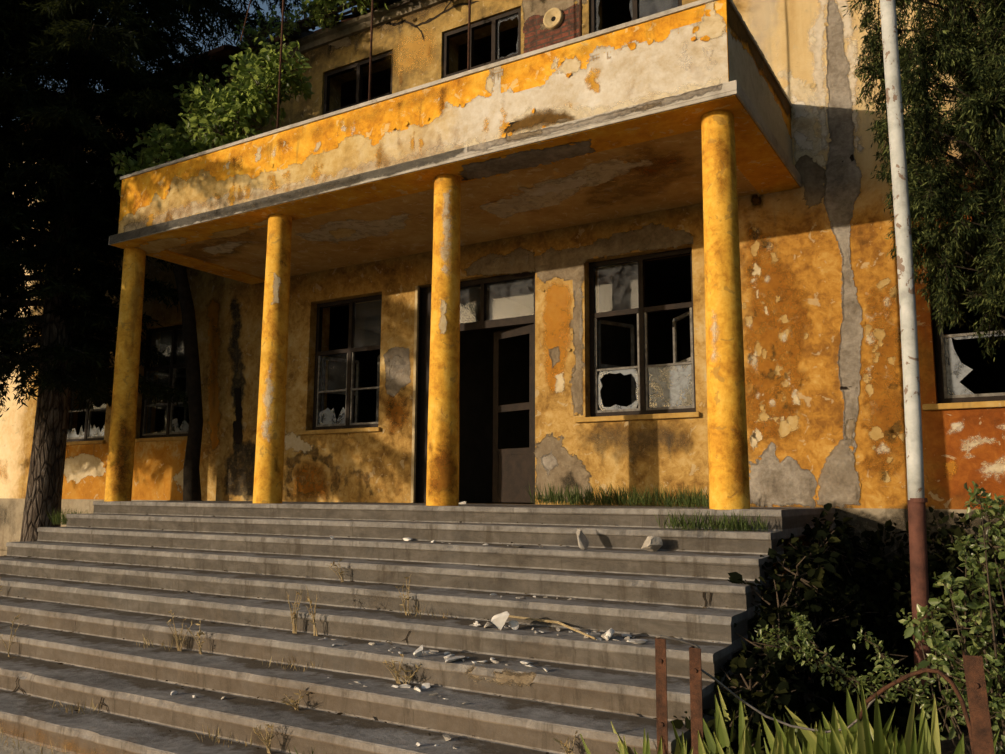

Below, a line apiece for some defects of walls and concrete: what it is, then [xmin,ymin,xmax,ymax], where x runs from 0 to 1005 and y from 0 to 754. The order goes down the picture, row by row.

peeling [118,0,906,508]
peeling [64,453,106,484]
damp [224,299,256,501]
peeling [983,462,1005,474]